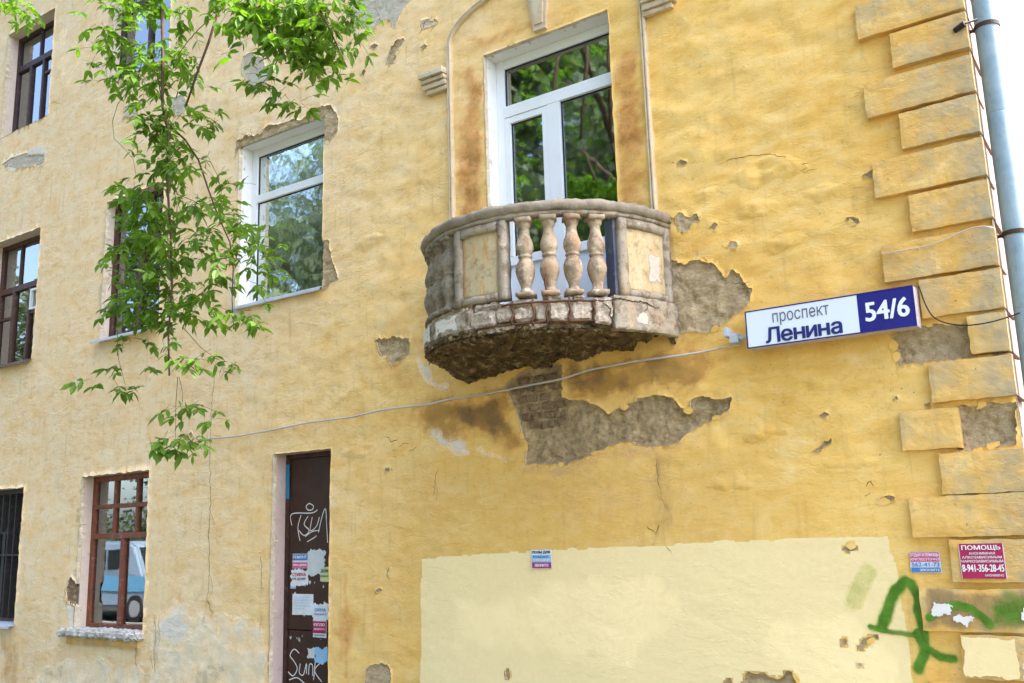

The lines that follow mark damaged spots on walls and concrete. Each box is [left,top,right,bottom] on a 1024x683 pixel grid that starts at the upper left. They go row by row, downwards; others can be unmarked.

spalling [235,105,338,157]
peeling [4,145,48,172]
spalling [320,240,338,290]
spalling [648,254,752,334]
spalling [372,333,410,366]
spalling [889,324,1008,366]
damp [420,365,519,454]
spalling [505,364,732,467]
spalling [958,397,1023,451]
spalling [65,577,79,628]